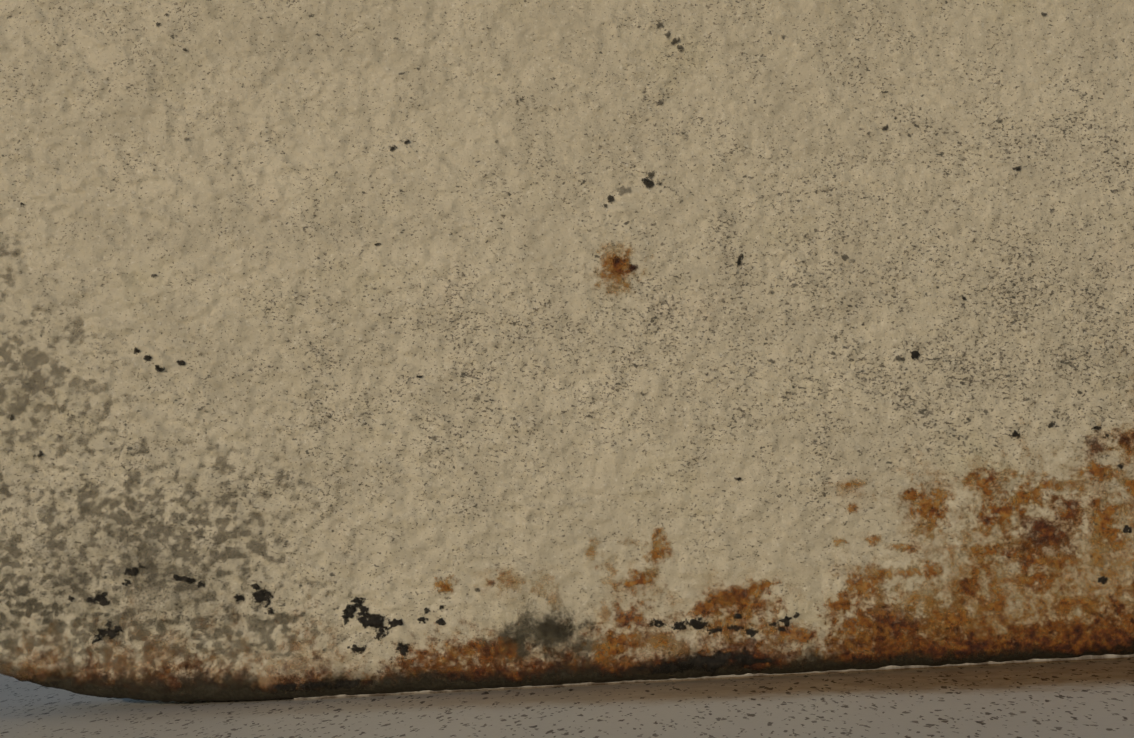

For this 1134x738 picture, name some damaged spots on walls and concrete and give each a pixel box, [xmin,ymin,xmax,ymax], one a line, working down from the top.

rust [597,250,637,291]
rust [1120,430,1134,455]
rust [365,441,1134,683]